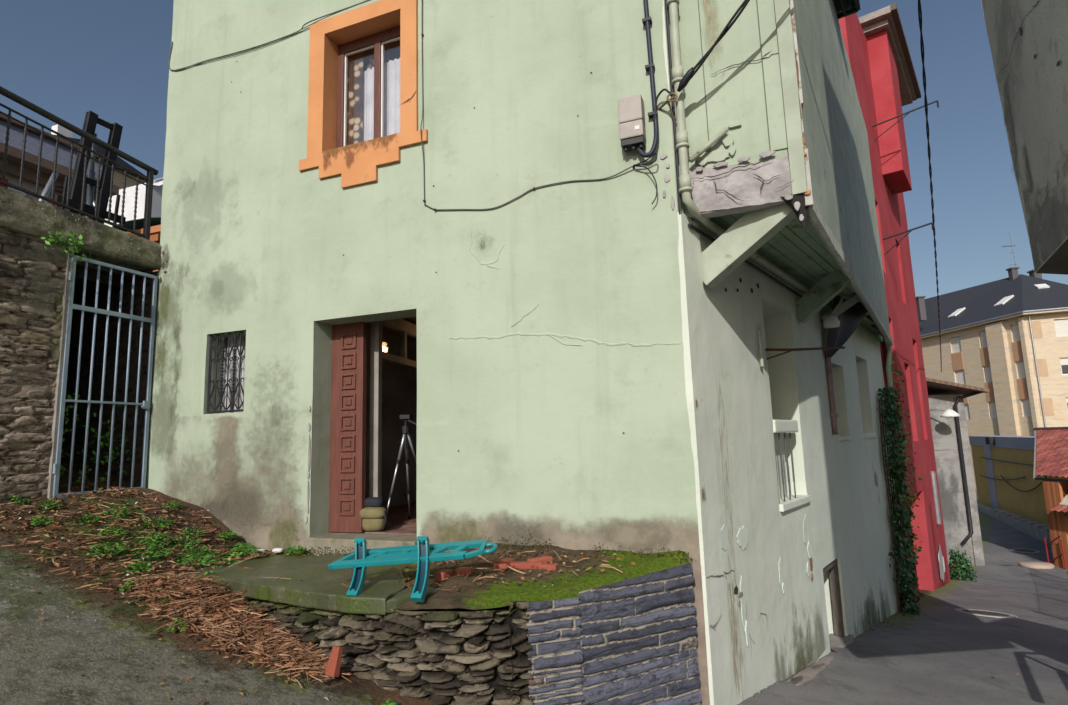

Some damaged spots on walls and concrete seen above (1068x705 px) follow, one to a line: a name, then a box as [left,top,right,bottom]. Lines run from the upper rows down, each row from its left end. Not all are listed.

spalling [689,123,811,230]
damp [1003,83,1018,181]
damp [167,417,297,549]
damp [421,515,701,567]